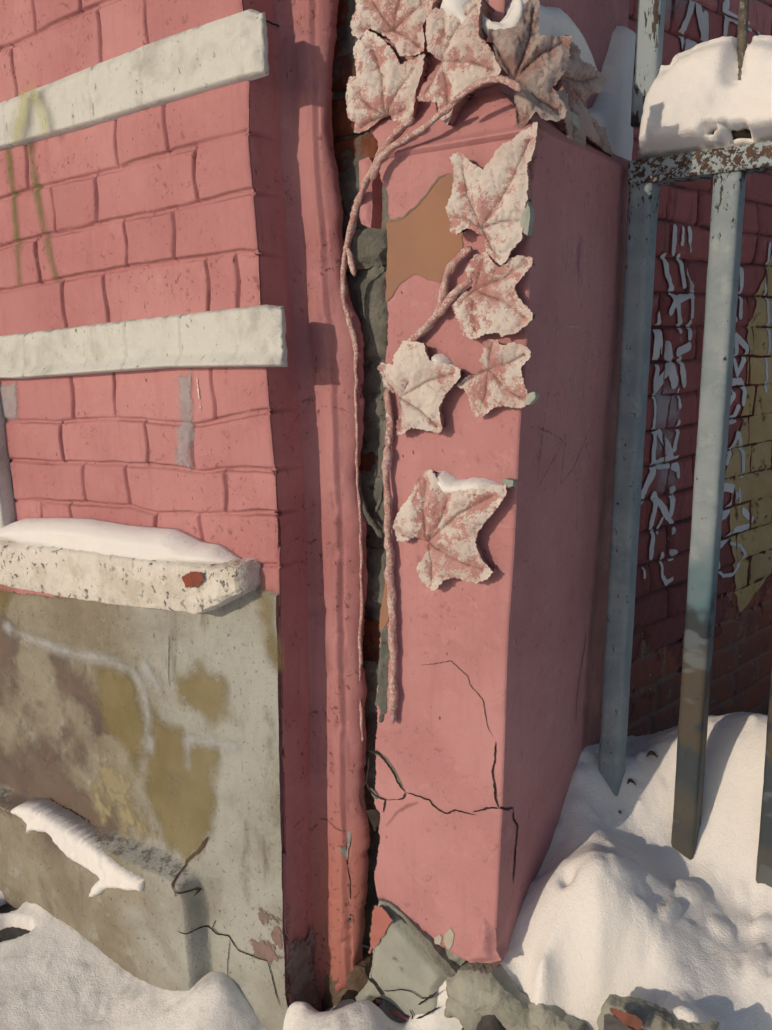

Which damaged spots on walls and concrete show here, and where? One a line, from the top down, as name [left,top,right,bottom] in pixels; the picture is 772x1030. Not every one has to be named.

peeling [385,173,463,301]
crack [332,0,519,946]
peeling [627,623,684,736]
peeling [708,577,772,716]
crack [171,837,208,896]
crack [178,920,281,1007]
peeling [249,905,320,1006]
spalling [368,898,465,977]